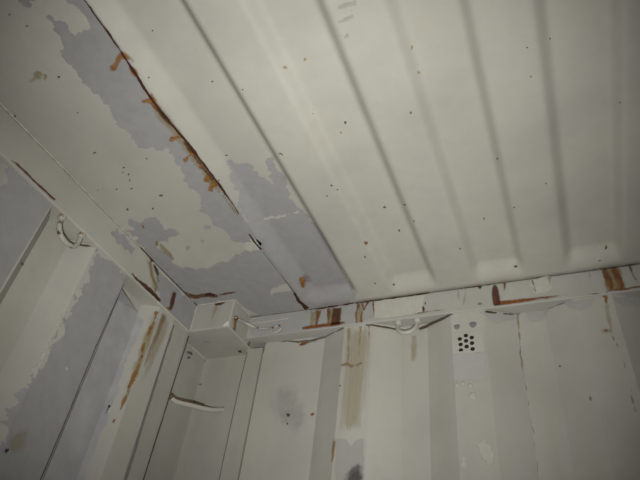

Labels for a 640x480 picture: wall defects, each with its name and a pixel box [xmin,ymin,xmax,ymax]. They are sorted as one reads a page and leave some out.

rust [84,0,239,215]
peeling [46,0,426,337]
rust [243,234,264,252]
rust [132,256,161,302]
rust [186,292,234,306]
rust [284,279,429,329]
rust [460,281,551,305]
rust [584,260,640,303]
peeling [0,247,143,480]
rust [128,292,176,388]